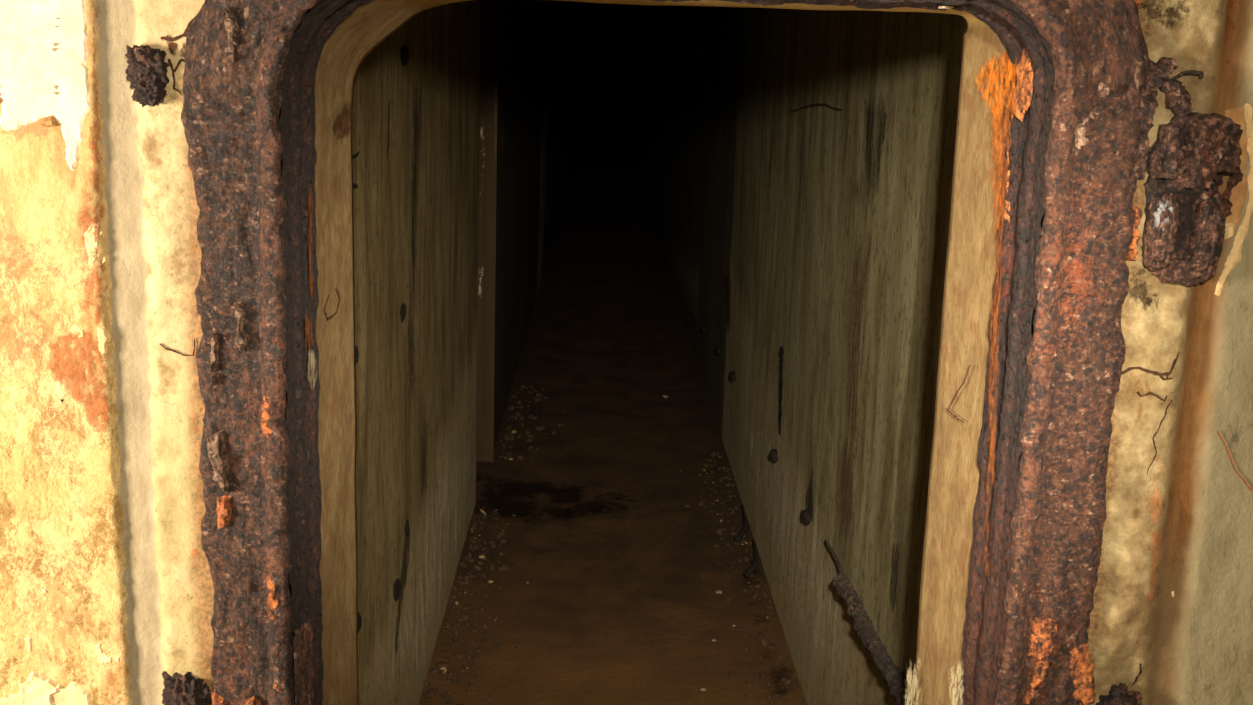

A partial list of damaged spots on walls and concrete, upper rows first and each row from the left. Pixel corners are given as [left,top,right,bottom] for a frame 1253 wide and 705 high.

flaking render [0,0,91,171]
corrosion [46,69,109,432]
corrosion [837,243,871,541]
corrosion [975,55,1016,575]
crack [1121,353,1179,474]
flaking render [1215,103,1253,296]
crack [1217,431,1253,491]
flaking render [0,671,91,705]